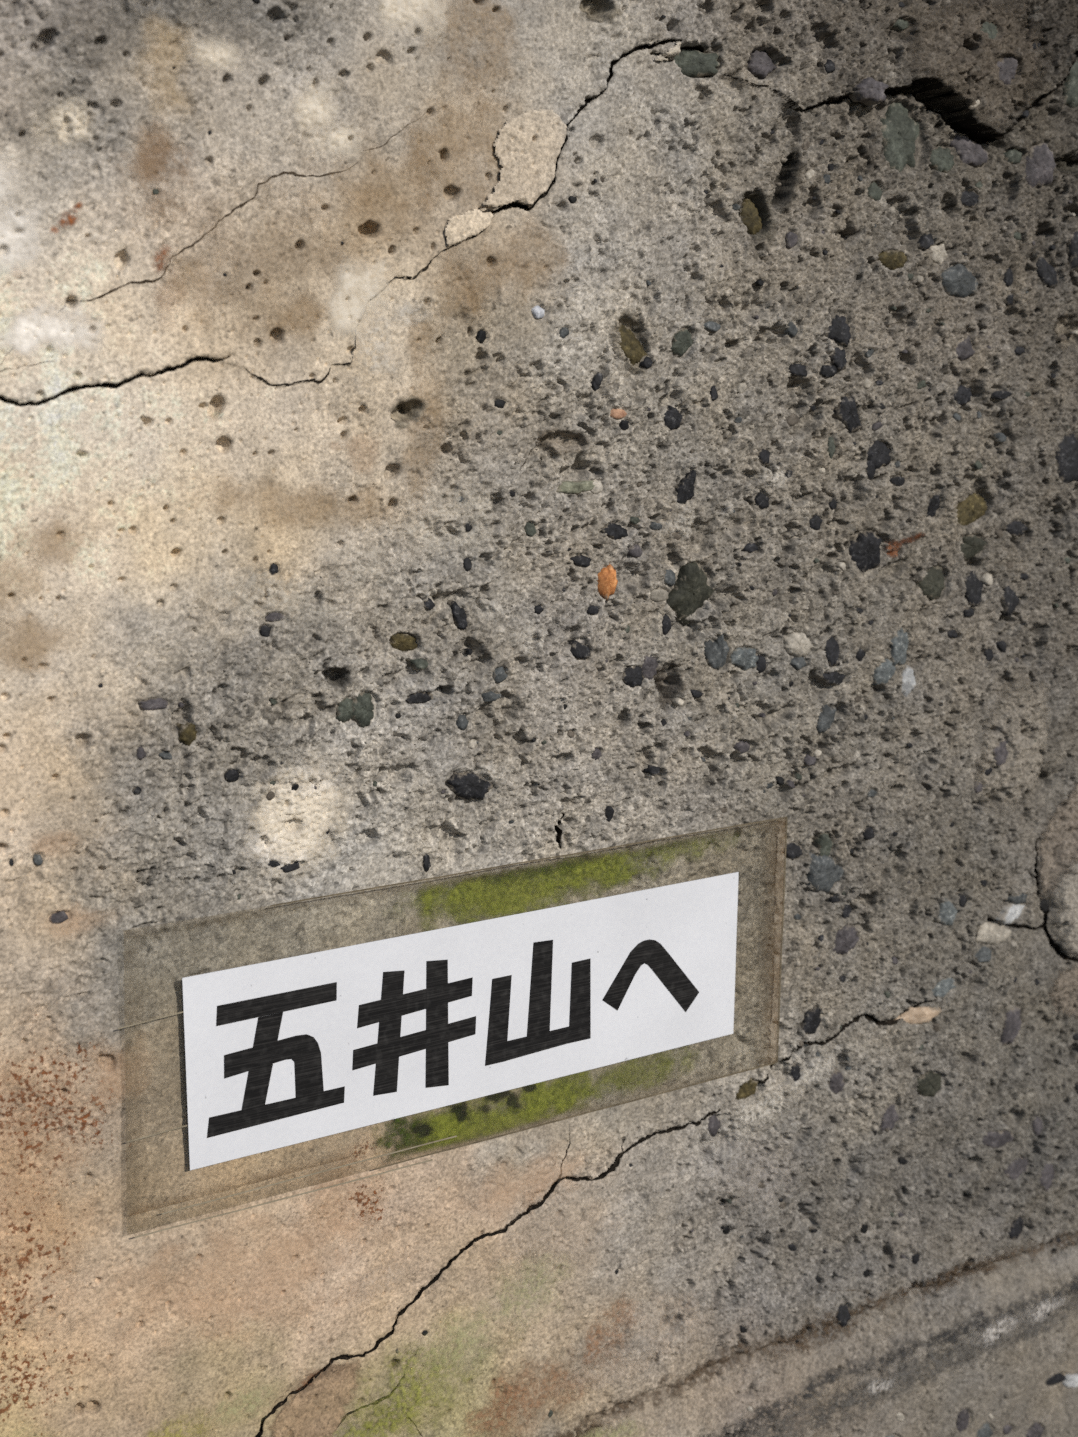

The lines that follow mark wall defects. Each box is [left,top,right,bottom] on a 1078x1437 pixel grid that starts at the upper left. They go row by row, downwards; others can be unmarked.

peeling [445,109,567,246]
crack [0,39,1078,406]
peeling [654,41,681,61]
rust [0,1042,116,1435]
crack [255,840,1078,1437]